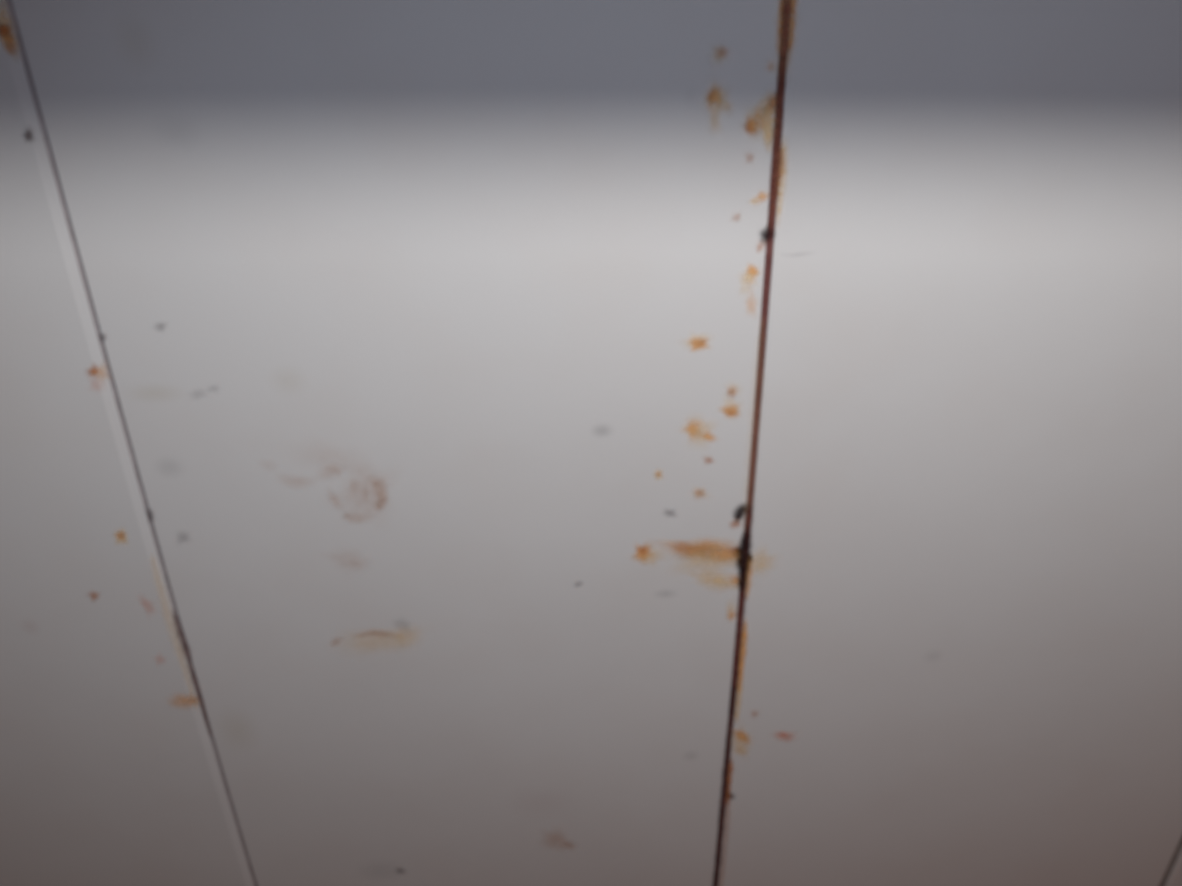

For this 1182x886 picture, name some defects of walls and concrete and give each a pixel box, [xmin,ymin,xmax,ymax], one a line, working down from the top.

corrosion [747,0,795,224]
corrosion [686,511,752,885]